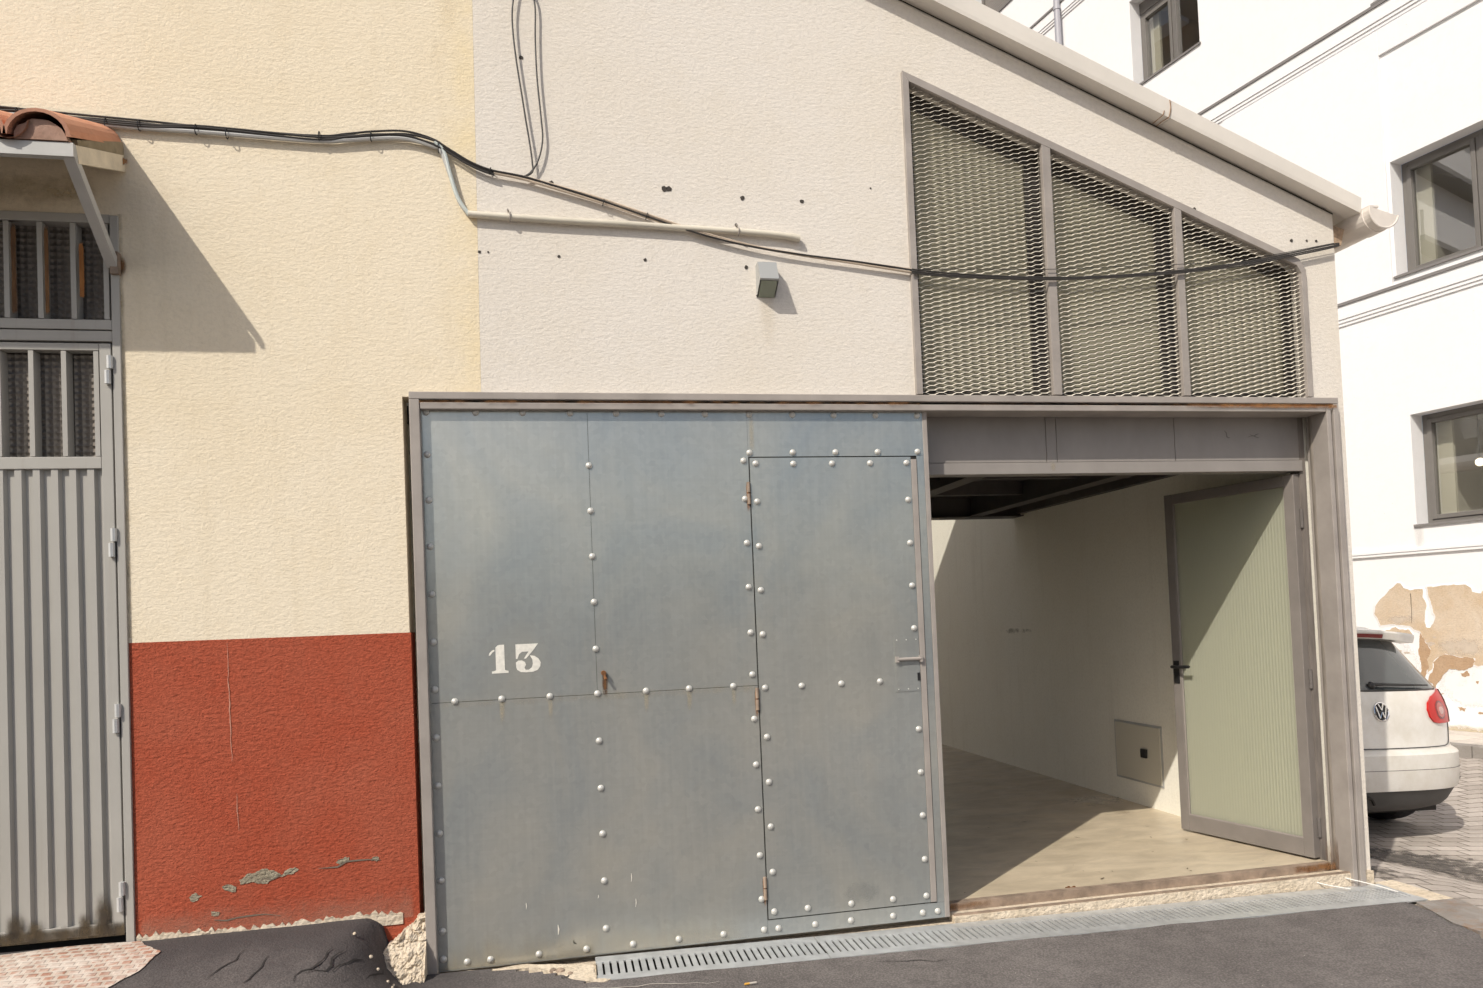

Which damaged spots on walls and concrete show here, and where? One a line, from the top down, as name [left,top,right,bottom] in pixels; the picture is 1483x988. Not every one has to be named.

peeling [1369,581,1483,694]
spalling [222,867,299,892]
spalling [318,856,379,869]
spalling [136,893,427,988]